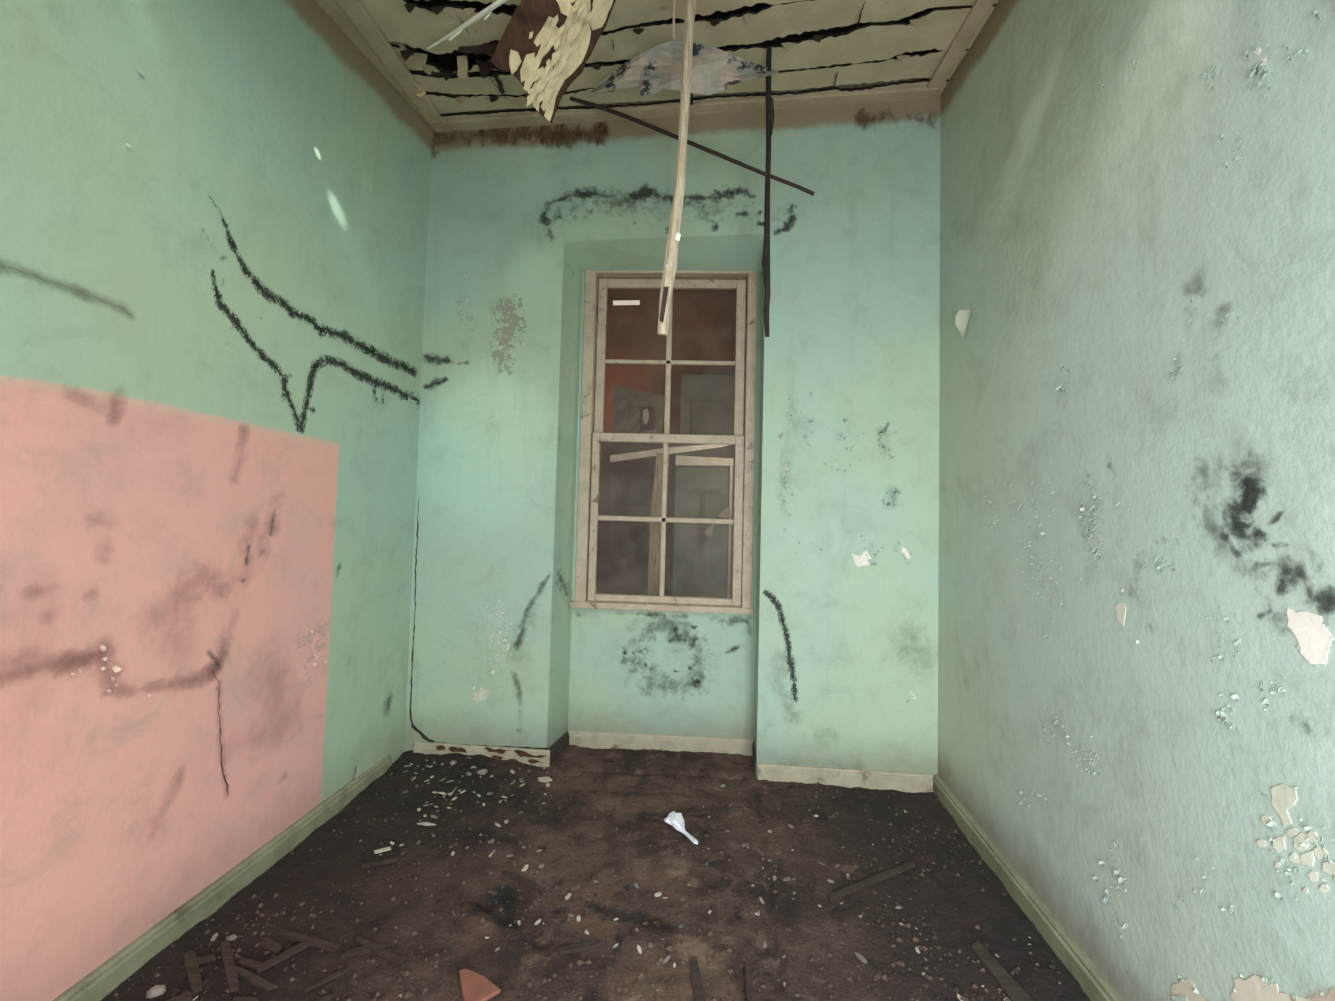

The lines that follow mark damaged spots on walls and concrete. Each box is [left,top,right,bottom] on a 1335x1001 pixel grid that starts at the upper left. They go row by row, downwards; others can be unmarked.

peeling [526,0,598,108]
leakage [541,185,796,234]
crack [209,196,420,434]
leakage [1211,473,1283,557]
crack [409,500,549,750]
leakage [664,620,700,686]
crack [764,590,798,701]
leakage [1277,566,1335,613]
spalling [1284,607,1335,664]
crack [212,661,229,794]
spalling [1257,784,1335,901]
spalling [1230,974,1335,1001]